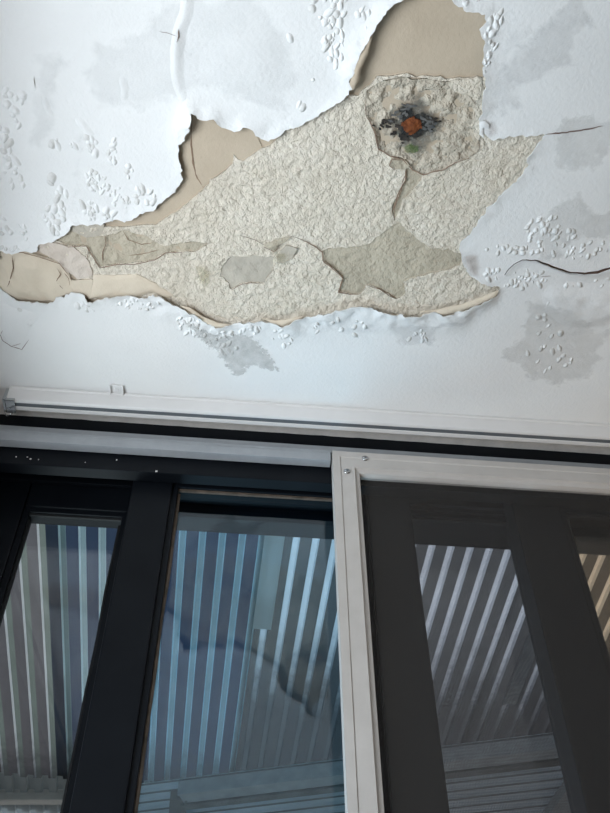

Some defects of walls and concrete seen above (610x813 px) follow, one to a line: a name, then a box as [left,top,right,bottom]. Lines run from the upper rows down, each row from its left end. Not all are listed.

corrosion [401,116,422,135]
peeling [0,0,566,353]
crack [503,256,610,282]